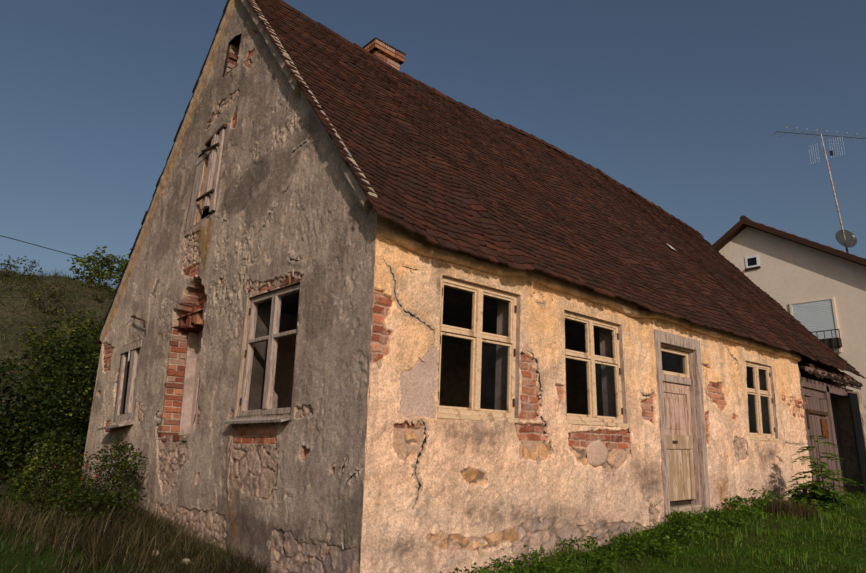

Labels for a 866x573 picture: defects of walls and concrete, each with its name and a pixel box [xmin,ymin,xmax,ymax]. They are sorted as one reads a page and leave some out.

flaking render [182,230,201,277]
flaking render [245,269,303,296]
flaking render [370,290,392,368]
crack [383,258,436,341]
flaking render [514,346,551,465]
flaking render [641,395,654,423]
flaking render [704,382,726,448]
flaking render [232,424,279,499]
crack [411,416,429,509]
flaking render [568,426,634,476]
flaking render [266,529,361,573]
flaking render [426,504,658,565]